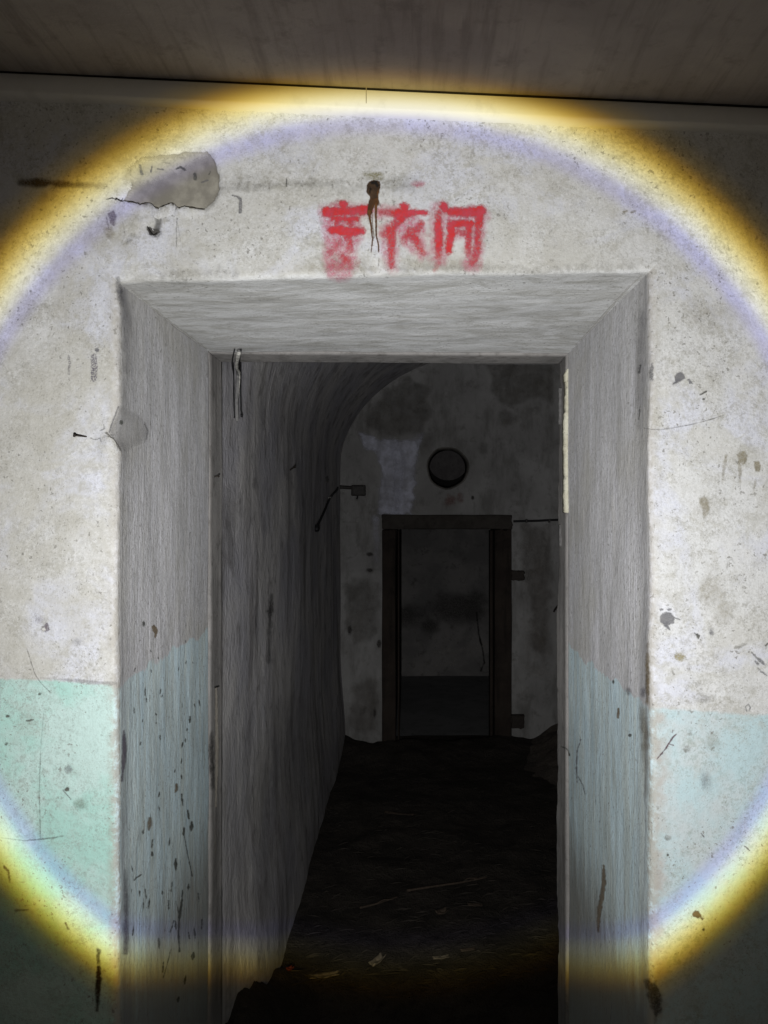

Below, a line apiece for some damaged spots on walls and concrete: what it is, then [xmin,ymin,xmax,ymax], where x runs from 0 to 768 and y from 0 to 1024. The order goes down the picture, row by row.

flaking render [106,152,219,236]
corrosion [367,181,380,252]
efflorescence [360,433,422,515]